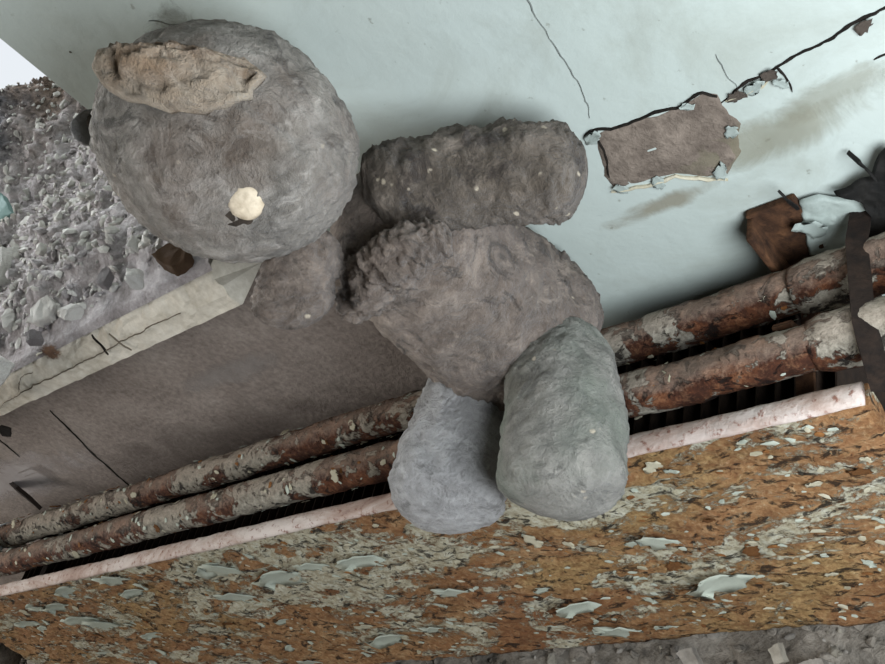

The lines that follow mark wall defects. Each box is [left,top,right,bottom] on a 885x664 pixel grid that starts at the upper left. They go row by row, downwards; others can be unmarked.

crack [527,0,590,118]
crack [716,6,885,103]
spalling [583,91,741,194]
peeling [791,194,866,255]